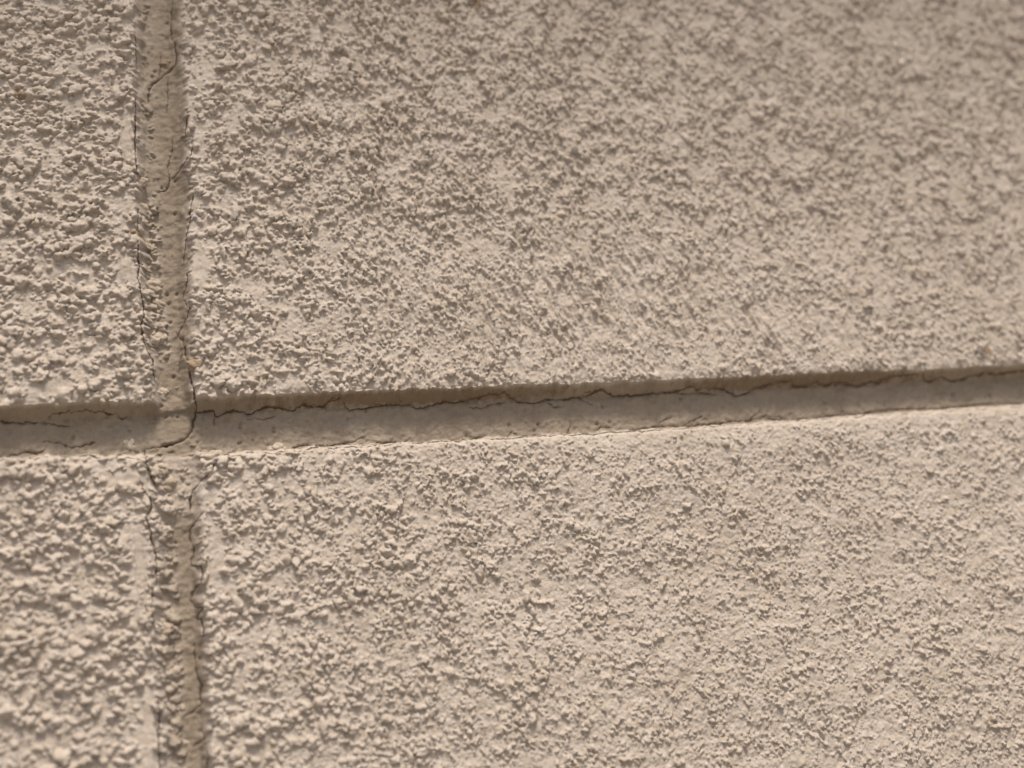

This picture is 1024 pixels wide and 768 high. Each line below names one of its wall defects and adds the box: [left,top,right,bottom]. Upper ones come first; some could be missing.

crack [134,0,194,193]
crack [1,409,128,457]
crack [123,194,1024,768]